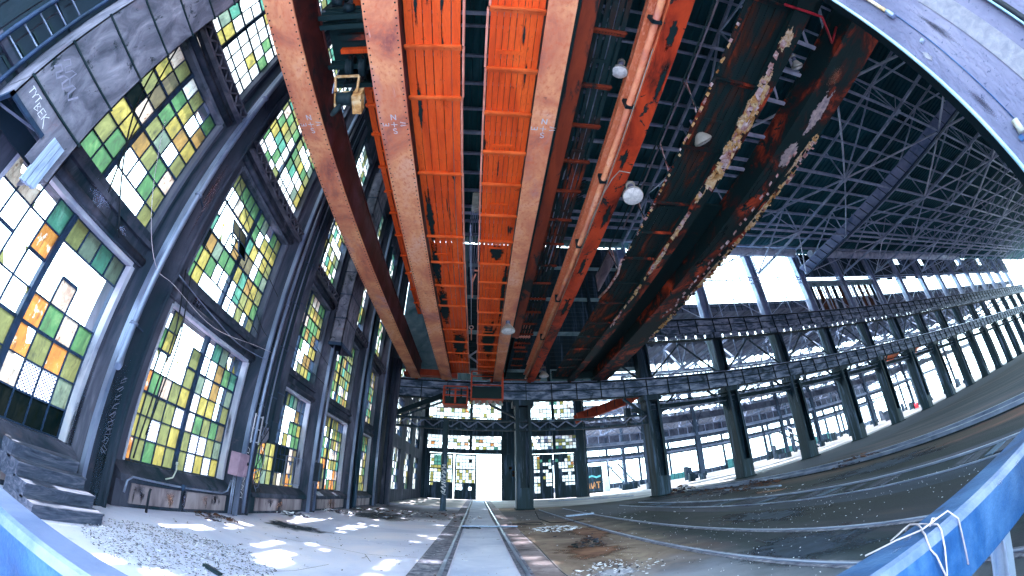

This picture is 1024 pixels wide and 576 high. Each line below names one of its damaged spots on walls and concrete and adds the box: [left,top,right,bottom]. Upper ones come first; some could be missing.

peeling [610,17,839,339]